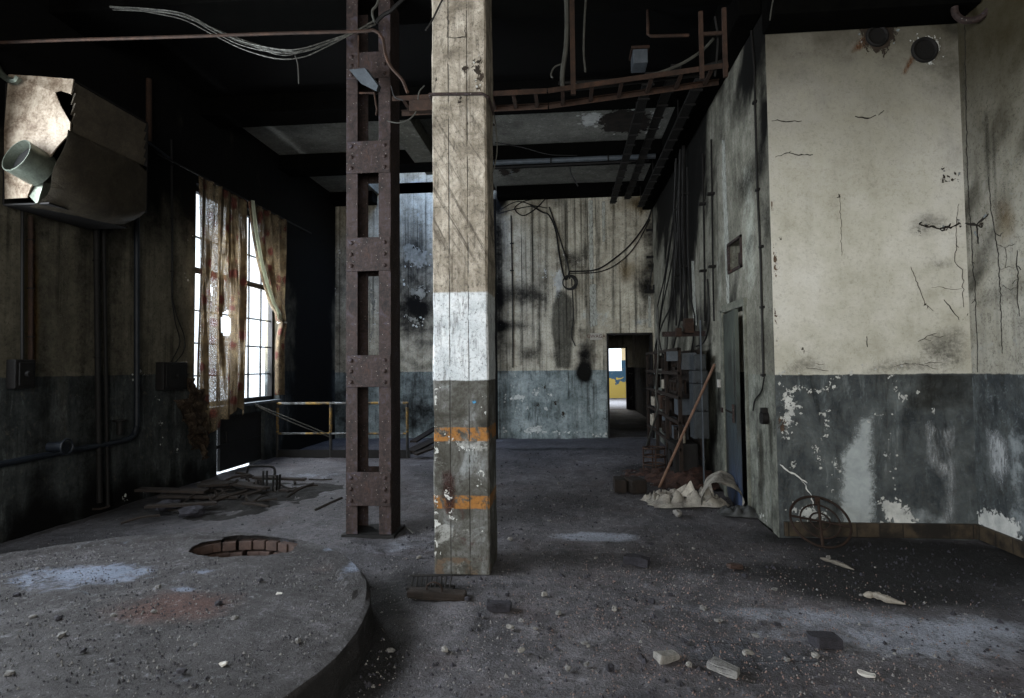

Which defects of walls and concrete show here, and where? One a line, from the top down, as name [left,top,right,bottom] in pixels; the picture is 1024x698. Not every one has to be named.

crack [894,24,1021,372]
leakage [552,292,574,368]
peeling [778,370,853,440]
flaking render [785,409,919,523]
leakage [990,437,1006,476]
peeling [434,490,457,555]
peeling [977,507,1023,541]